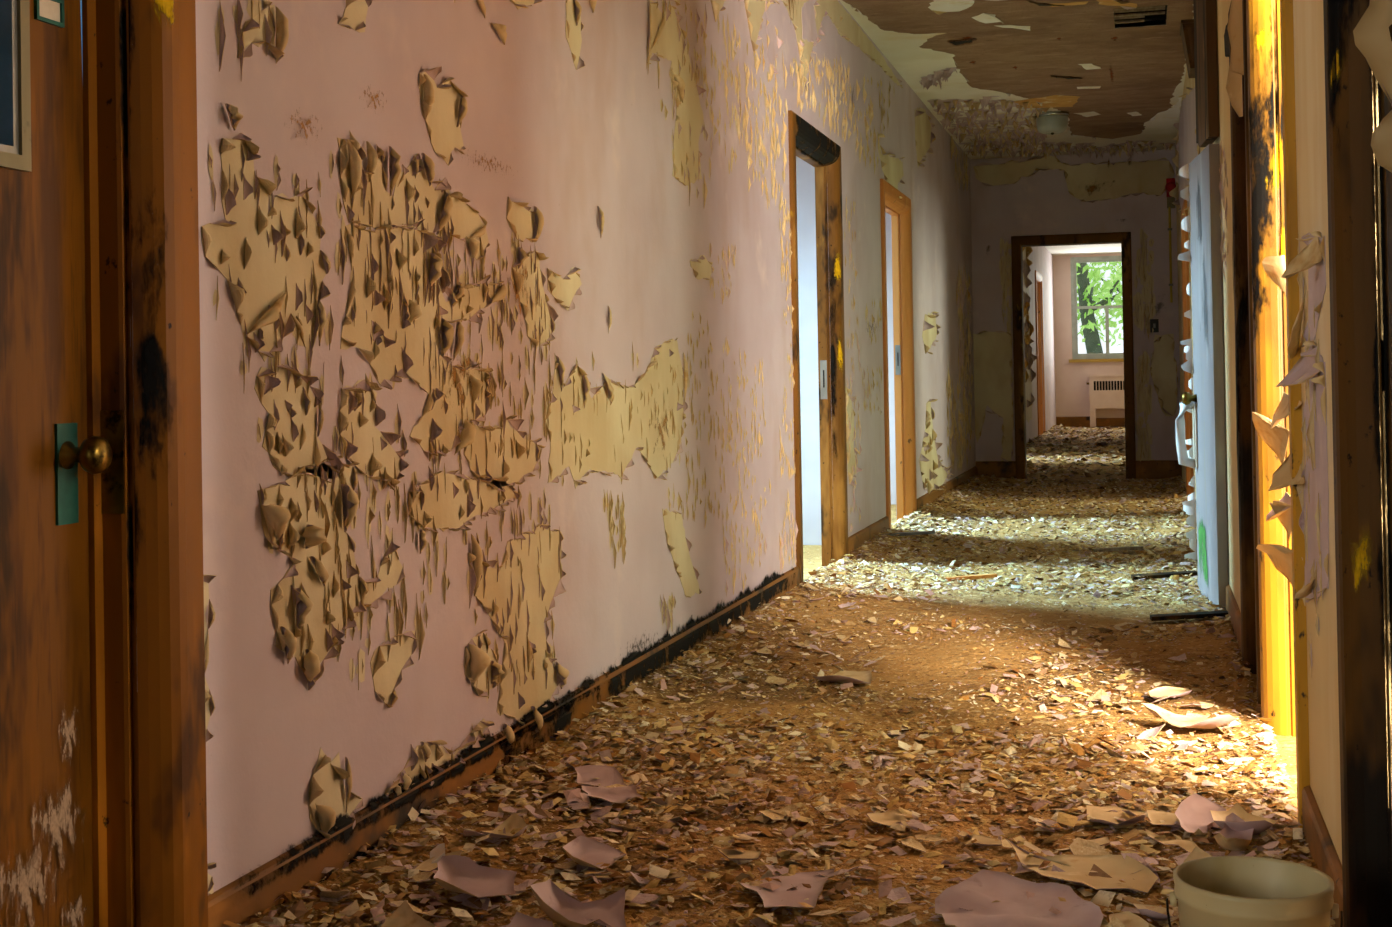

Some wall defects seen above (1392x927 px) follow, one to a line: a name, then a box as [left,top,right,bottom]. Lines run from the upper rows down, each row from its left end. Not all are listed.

damp [119,0,164,312]
peeling [1219,140,1228,288]
peeling [1226,0,1244,117]
damp [1327,0,1370,132]
damp [1369,66,1381,122]
damp [127,332,172,622]
peeling [1252,231,1329,678]
damp [1354,156,1392,674]
peeling [309,747,363,842]